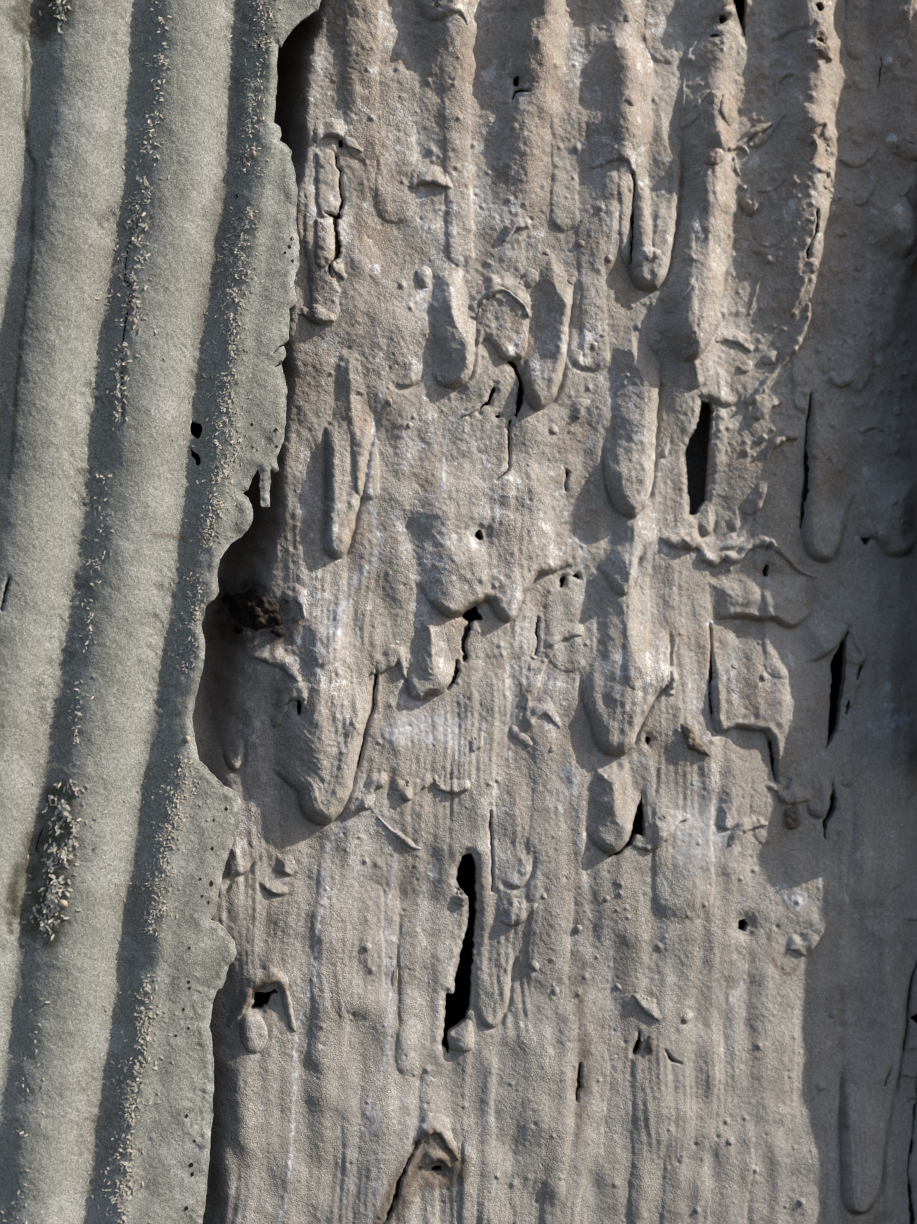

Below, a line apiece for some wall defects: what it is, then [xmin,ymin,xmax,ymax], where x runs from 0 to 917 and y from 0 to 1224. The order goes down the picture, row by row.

damp [14,0,71,39]
crack [326,157,343,275]
crack [800,394,811,528]
spalling [221,588,286,638]
damp [12,787,74,944]
crack [885,963,917,1224]
crack [383,1143,417,1224]